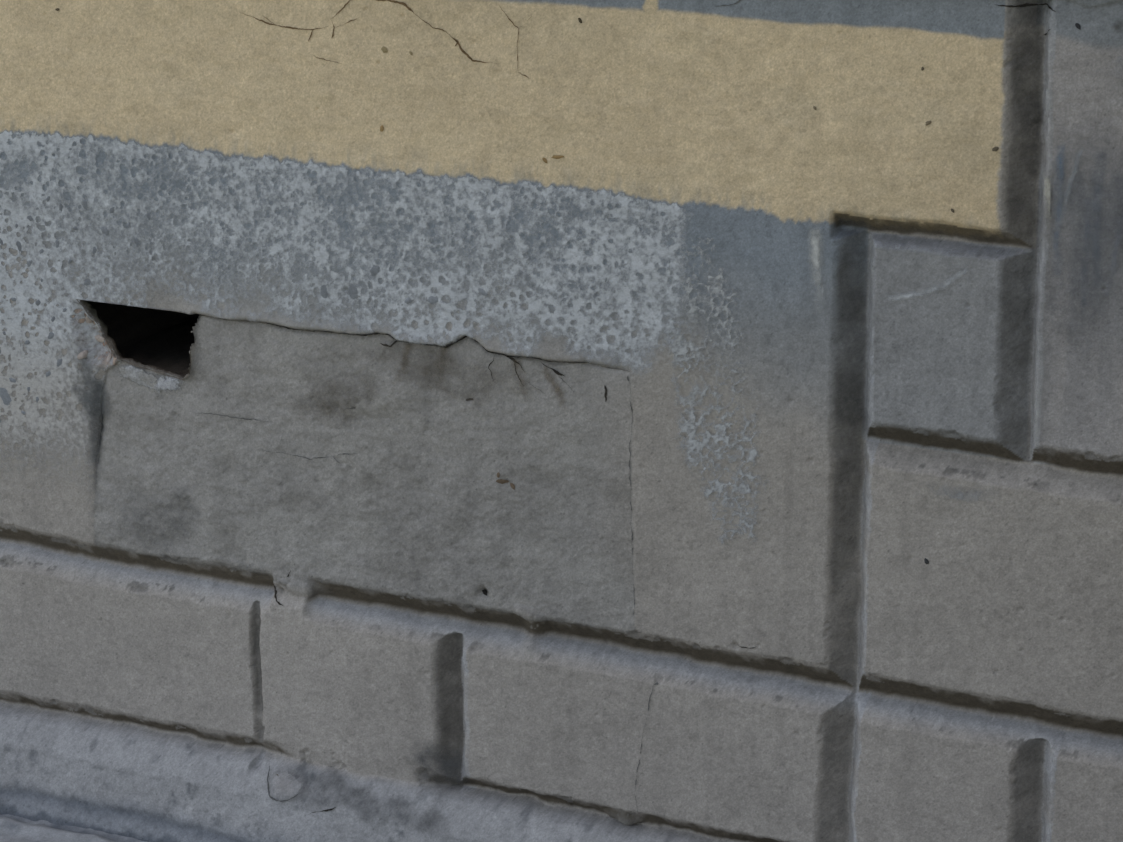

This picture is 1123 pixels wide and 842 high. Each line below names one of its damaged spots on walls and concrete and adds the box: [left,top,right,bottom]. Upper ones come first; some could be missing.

crack [239,0,530,79]
peeling [0,130,686,469]
crack [201,315,635,614]